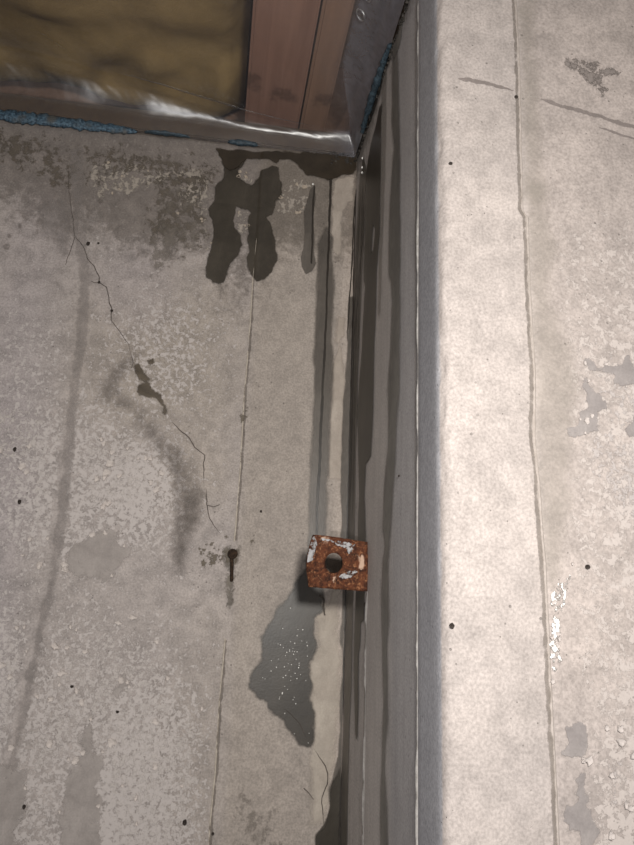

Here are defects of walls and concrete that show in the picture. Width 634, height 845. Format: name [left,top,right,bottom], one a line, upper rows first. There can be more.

crack [65,169,133,366]
crack [172,422,220,532]
damp [0,15,404,845]
rust [223,547,240,605]